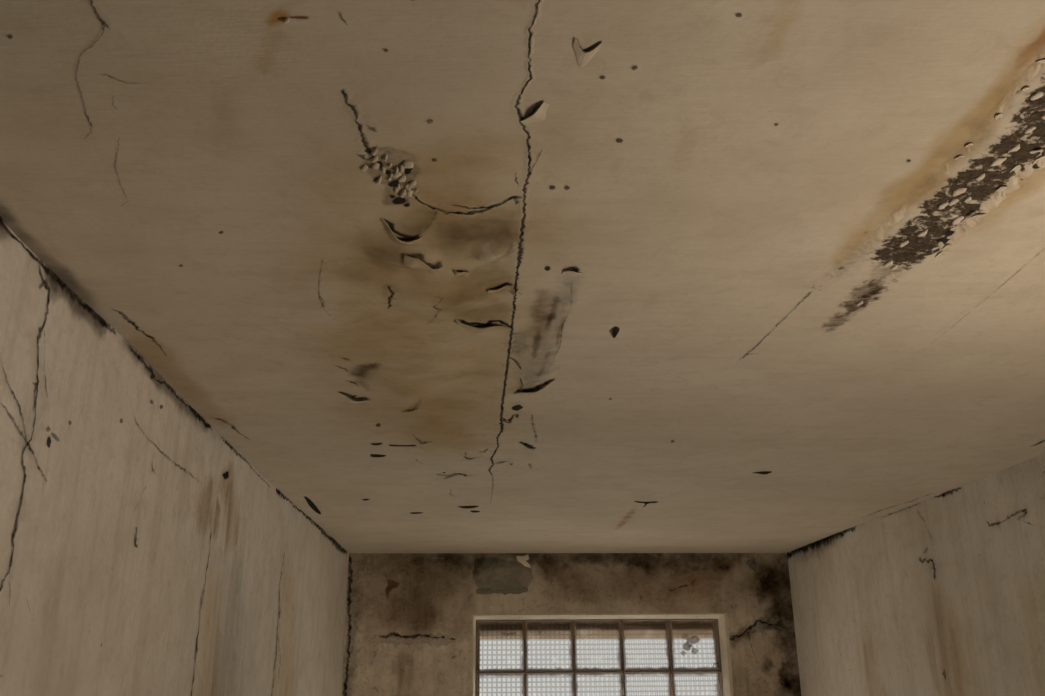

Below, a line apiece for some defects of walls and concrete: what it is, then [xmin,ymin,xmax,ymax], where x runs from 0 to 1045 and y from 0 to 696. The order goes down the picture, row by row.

crack [84,0,108,51]
crack [334,87,387,161]
spalling [801,46,1045,290]
crack [401,0,544,504]
crack [380,285,402,309]
crack [0,266,50,591]
peeling [516,554,531,568]
leakage [614,553,701,569]
crack [716,615,787,665]
leakage [760,568,801,696]